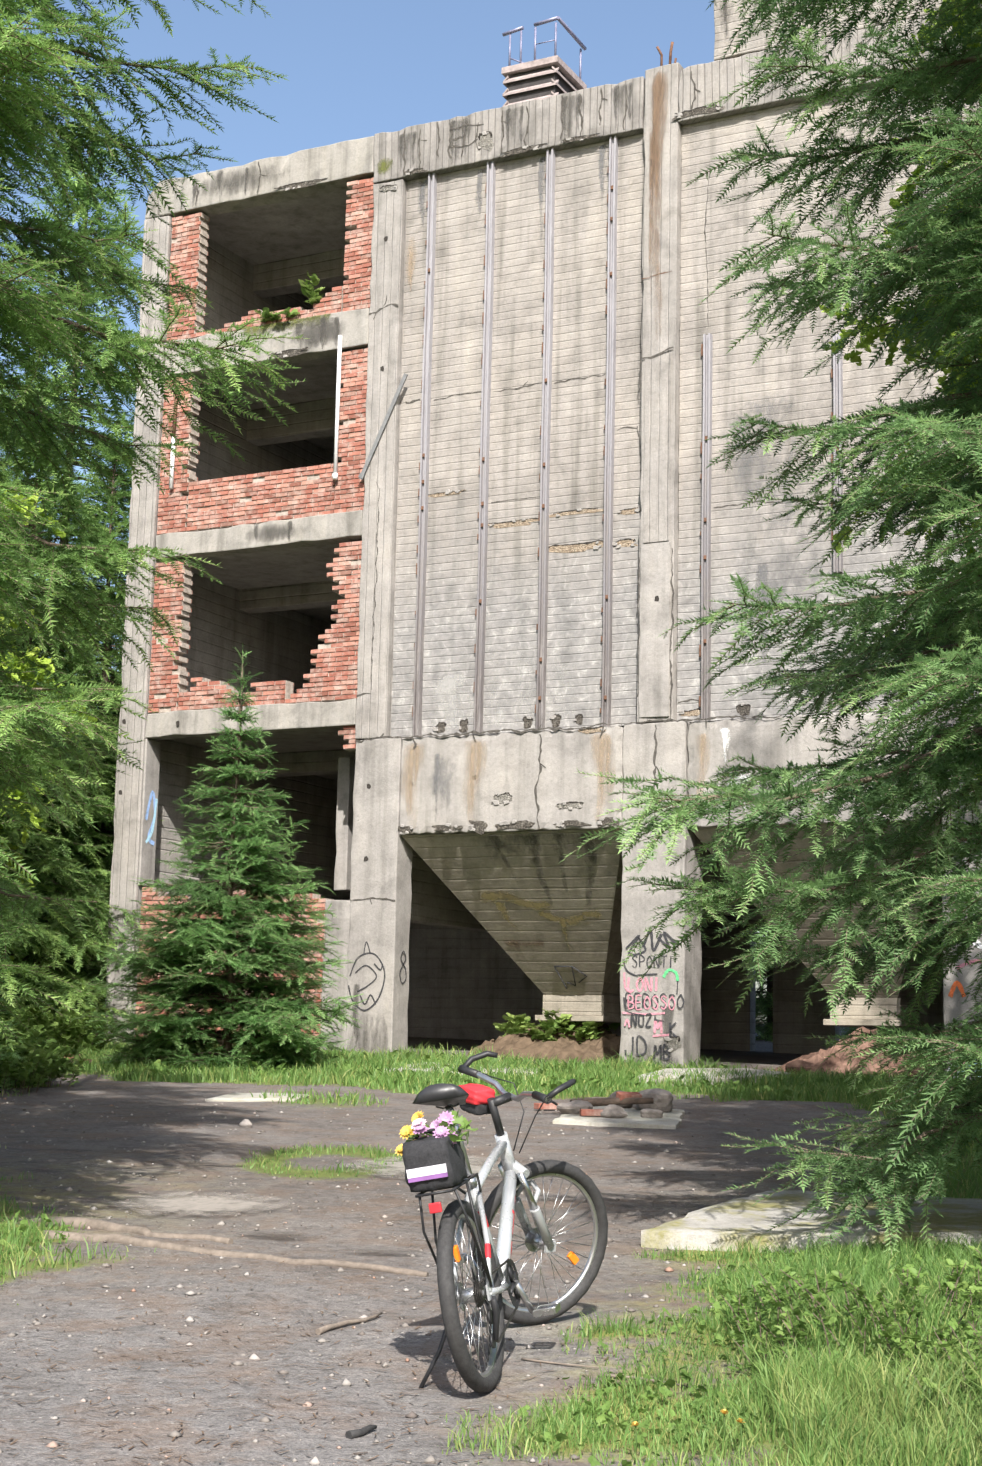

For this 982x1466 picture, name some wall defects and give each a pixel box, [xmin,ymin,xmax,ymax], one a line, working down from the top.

corrosion [650,75,666,193]
crack [714,496,792,508]
crack [356,482,380,697]
crack [355,548,781,835]
spalling [574,719,606,734]